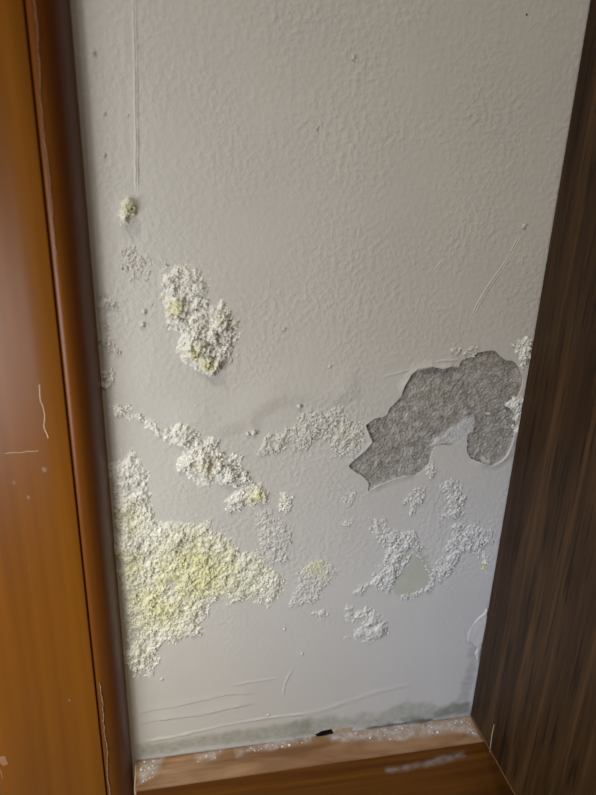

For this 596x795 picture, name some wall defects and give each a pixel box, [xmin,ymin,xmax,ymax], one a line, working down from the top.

leakage [117,198,137,226]
leakage [151,263,241,377]
peeling [346,350,522,495]
leakage [108,447,287,680]